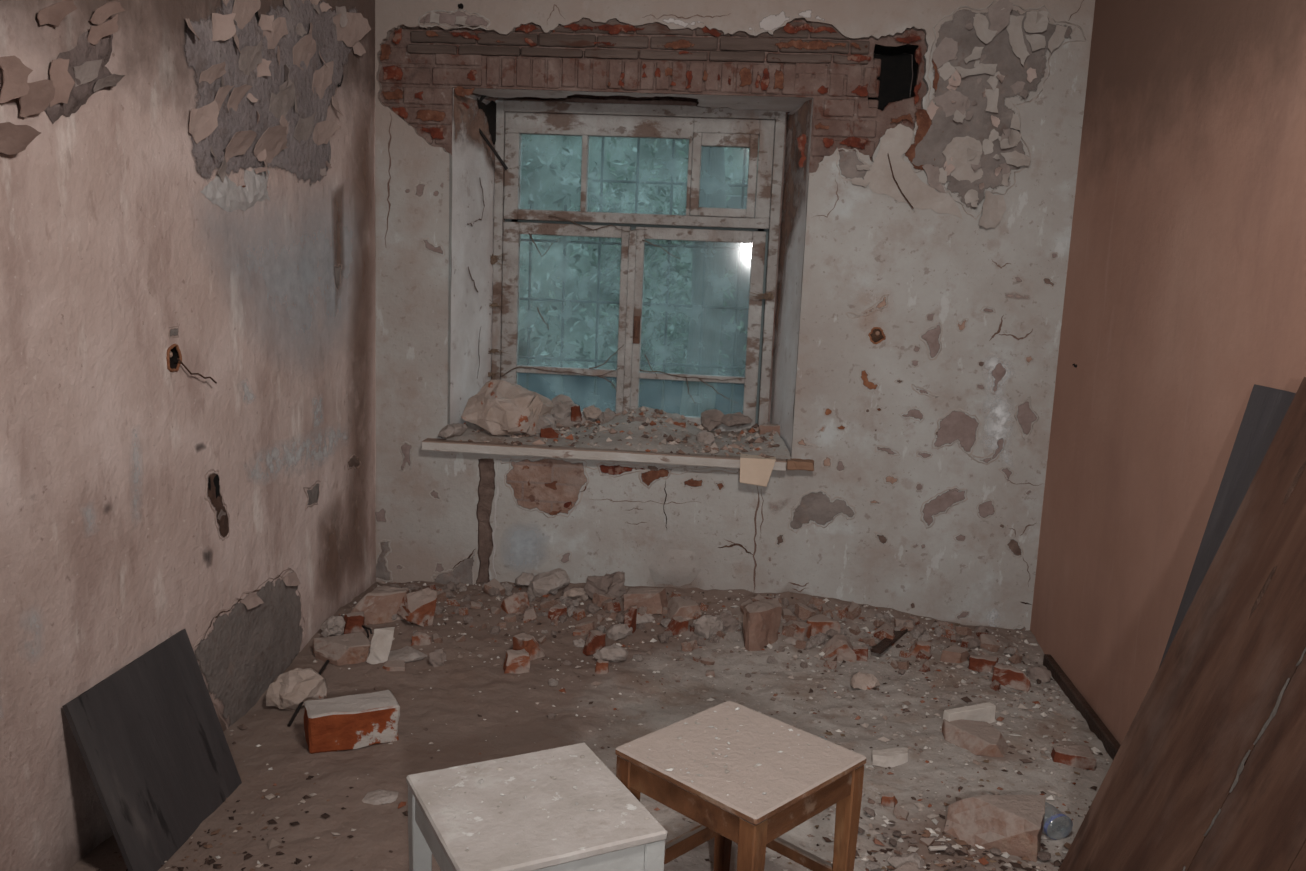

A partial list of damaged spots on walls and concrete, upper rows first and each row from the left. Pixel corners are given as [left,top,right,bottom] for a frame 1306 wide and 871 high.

crack [642,12,731,20]
peeling [0,1,126,155]
flaking render [185,0,1086,354]
peeling [911,306,996,368]
peeling [976,360,1008,395]
peeling [795,408,847,472]
peeling [859,368,1040,483]
flaking render [204,469,230,541]
flaking render [500,456,740,518]
flaking render [768,489,884,562]
peeling [906,482,1036,587]
flaking render [192,568,306,729]